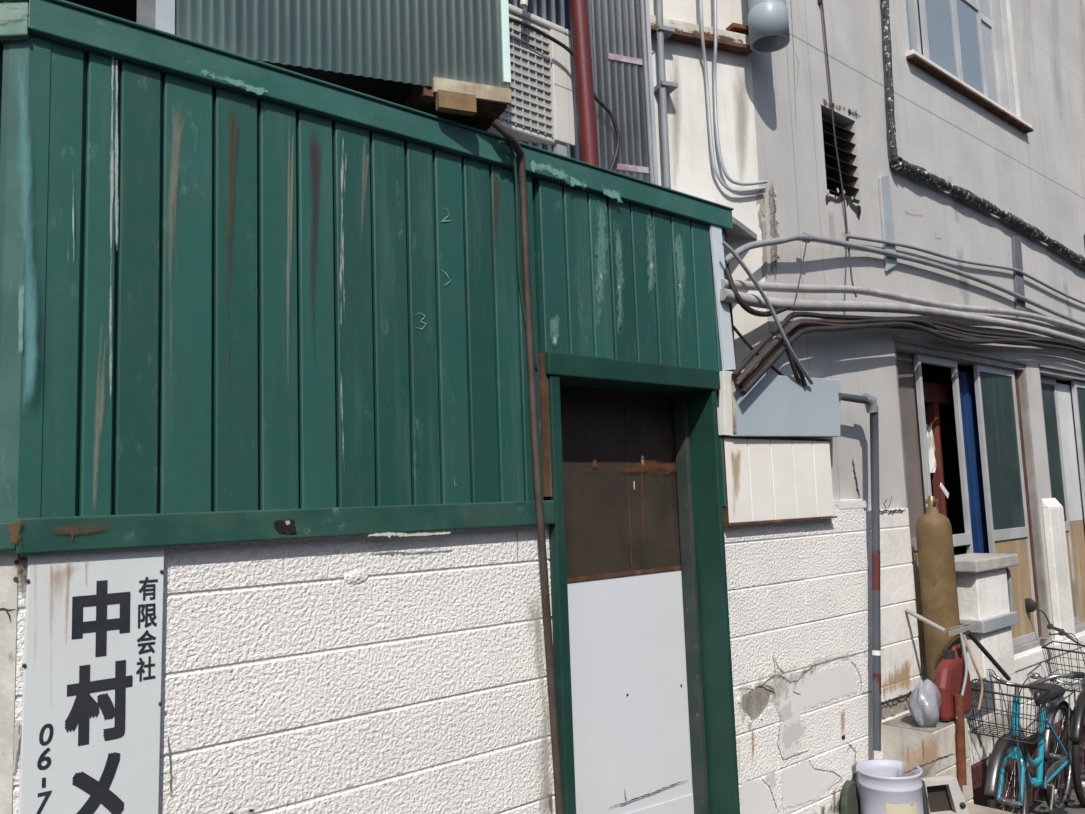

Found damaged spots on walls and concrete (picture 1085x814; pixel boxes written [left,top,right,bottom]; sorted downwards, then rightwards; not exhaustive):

rust [227,111,238,280]
rust [311,141,319,292]
rust [54,525,105,540]
rust [621,460,675,492]
crack [610,781,685,808]
peeling [737,663,858,814]